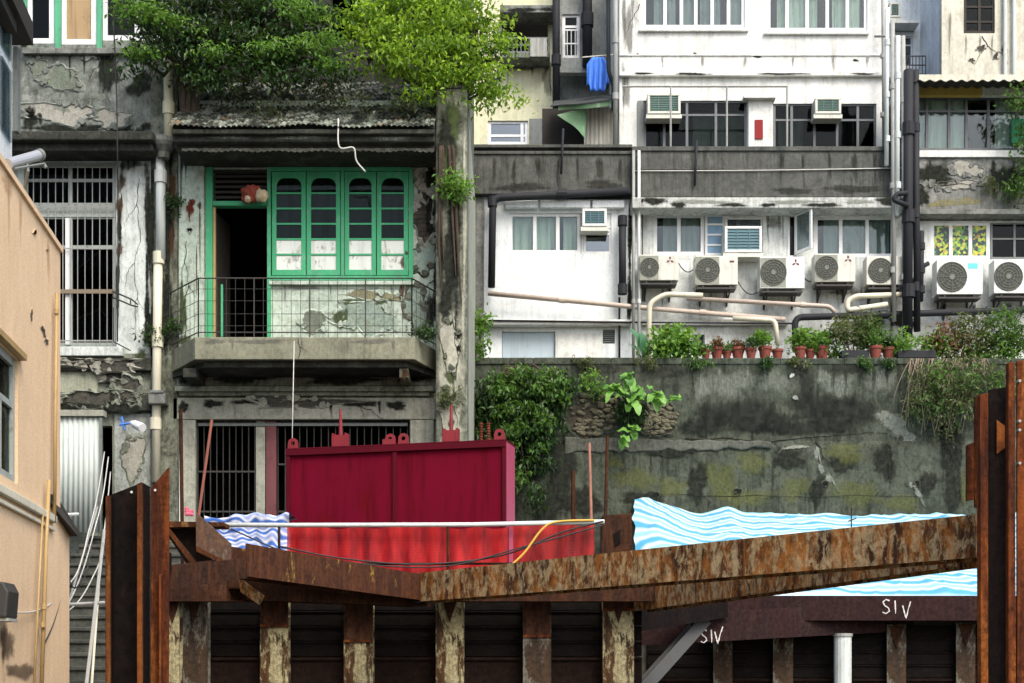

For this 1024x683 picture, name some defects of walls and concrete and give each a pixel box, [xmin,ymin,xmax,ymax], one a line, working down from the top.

flaking render [12,55,136,130]
flaking render [922,158,987,192]
flaking render [296,167,463,429]
water stain [399,103,467,441]
spalling [60,357,148,410]
water stain [307,377,384,385]
flaking render [119,433,149,487]
water stain [611,448,766,510]
water stain [640,363,916,510]
water stain [888,419,966,514]